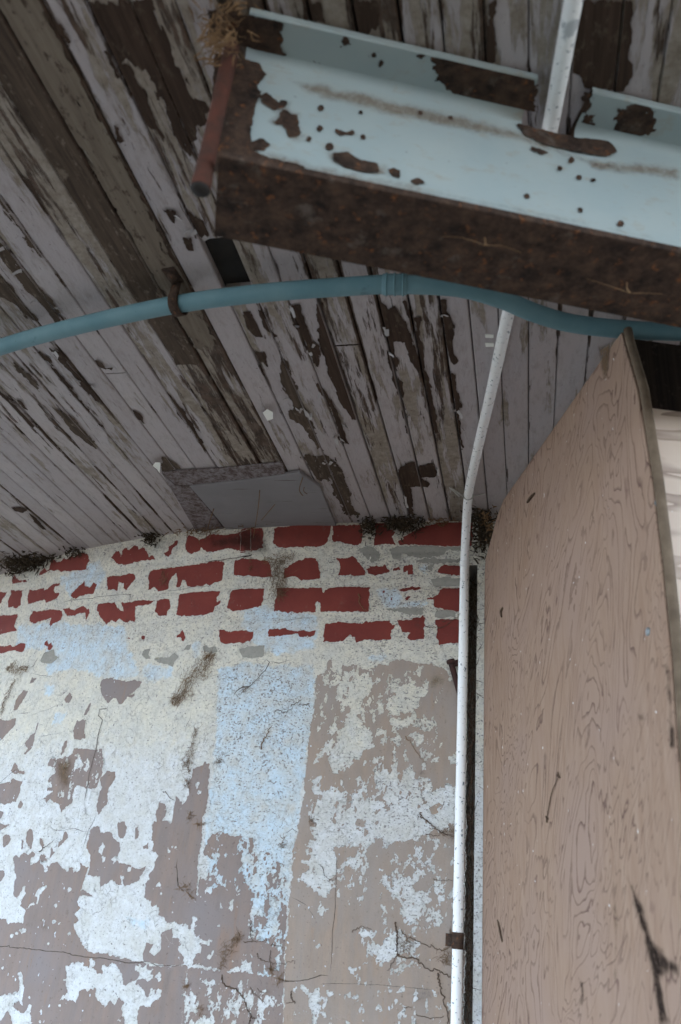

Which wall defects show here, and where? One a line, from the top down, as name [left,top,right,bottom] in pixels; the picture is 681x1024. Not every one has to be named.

peeling [0,0,210,303]
peeling [303,2,325,23]
rust [206,10,426,185]
peeling [350,0,380,35]
peeling [486,0,497,64]
peeling [573,0,633,92]
peeling [0,299,473,667]
peeling [0,658,468,1024]
crack [0,945,199,967]
crack [276,856,431,990]